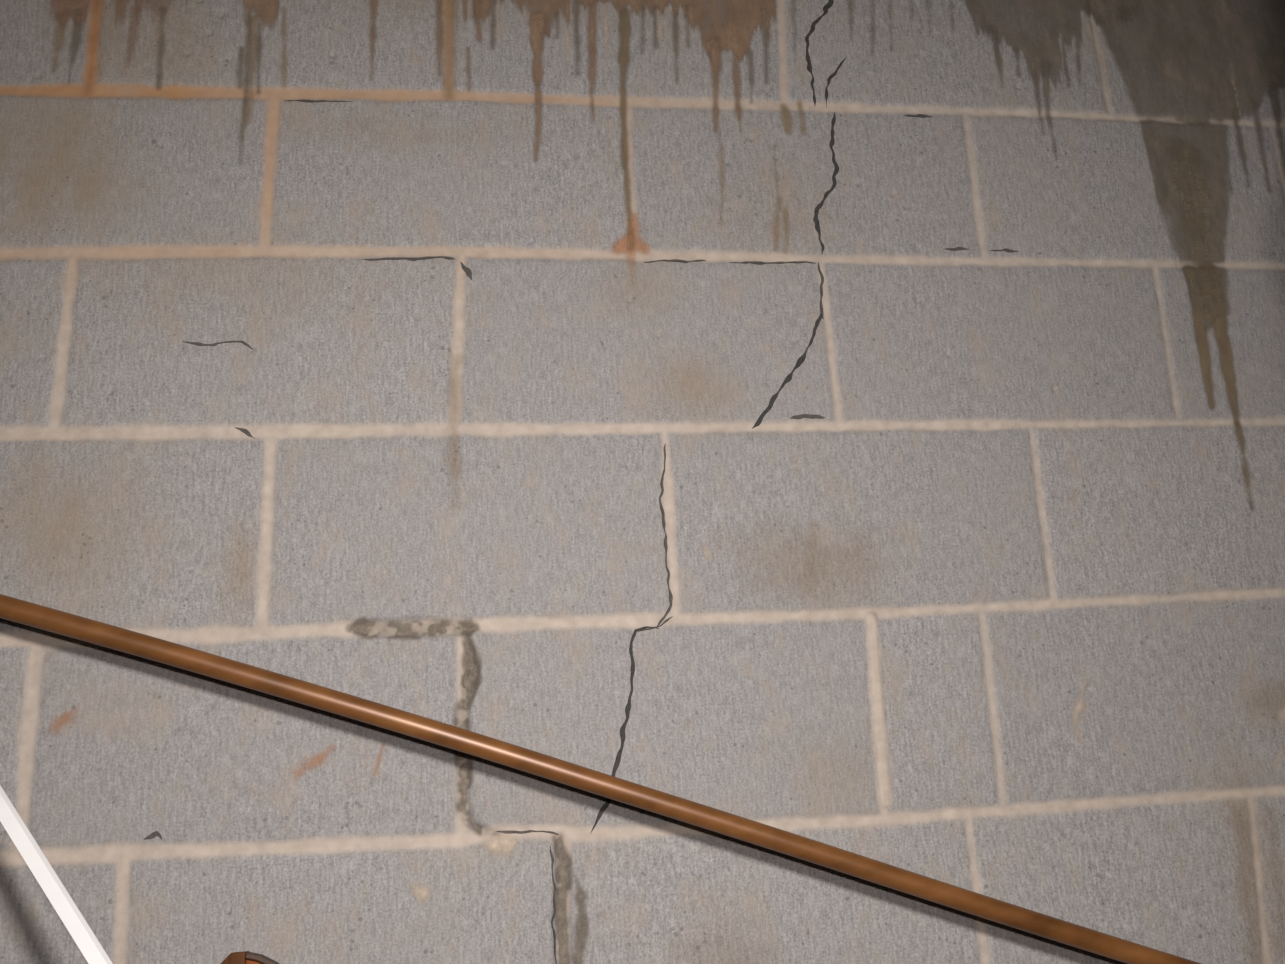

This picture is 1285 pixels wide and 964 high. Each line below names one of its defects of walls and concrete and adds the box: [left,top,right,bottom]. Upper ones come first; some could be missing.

crack [182,341,253,350]
water stain [238,0,279,139]
water stain [463,0,775,248]
crack [752,0,847,429]
water stain [966,0,1285,484]
crack [590,443,673,834]